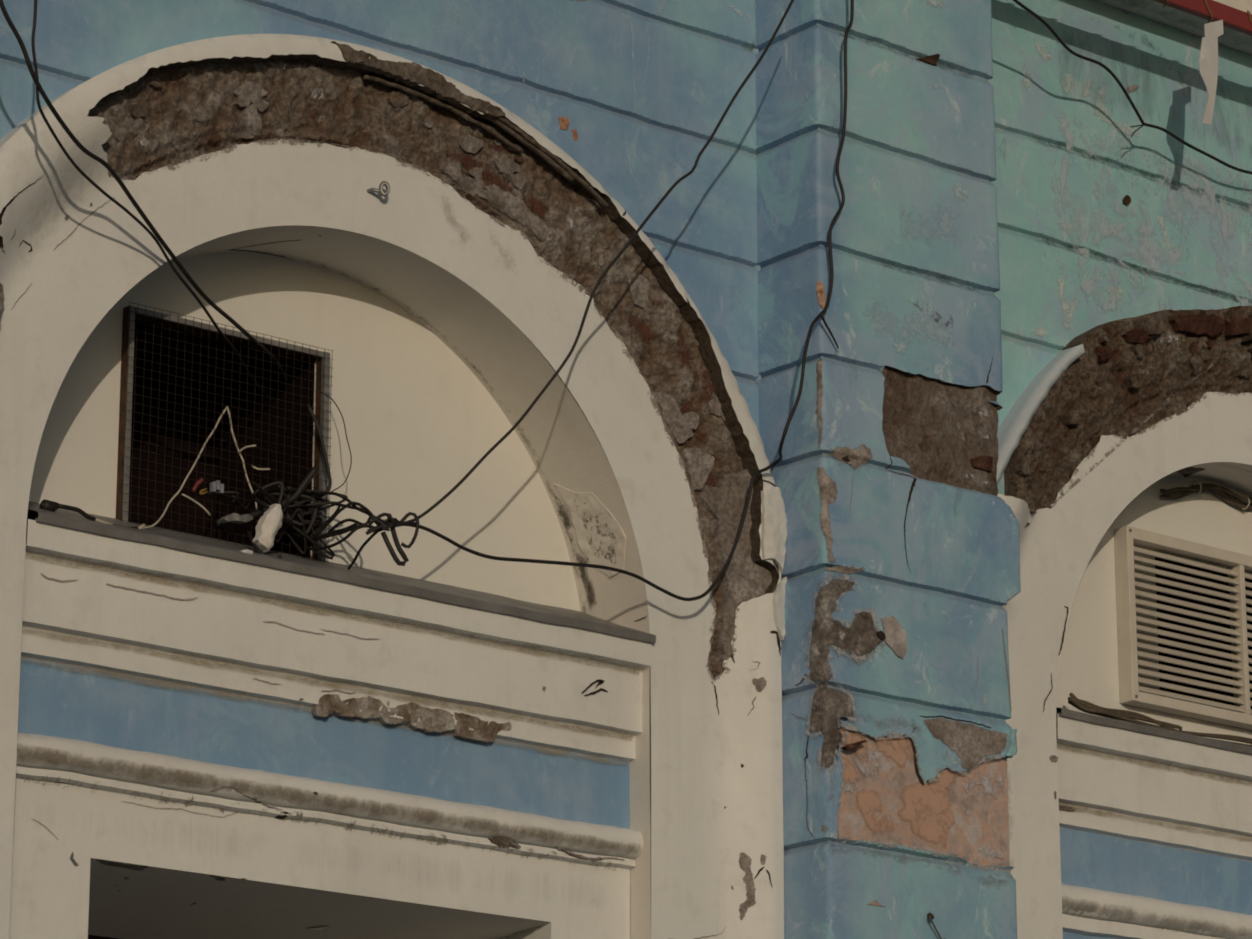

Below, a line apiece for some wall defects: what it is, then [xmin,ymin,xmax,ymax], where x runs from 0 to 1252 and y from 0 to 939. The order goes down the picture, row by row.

spalling [87,41,787,684]
spalling [882,306,1252,528]
flaking render [299,694,512,743]
flaking render [803,467,1018,872]
peeling [731,852,772,920]